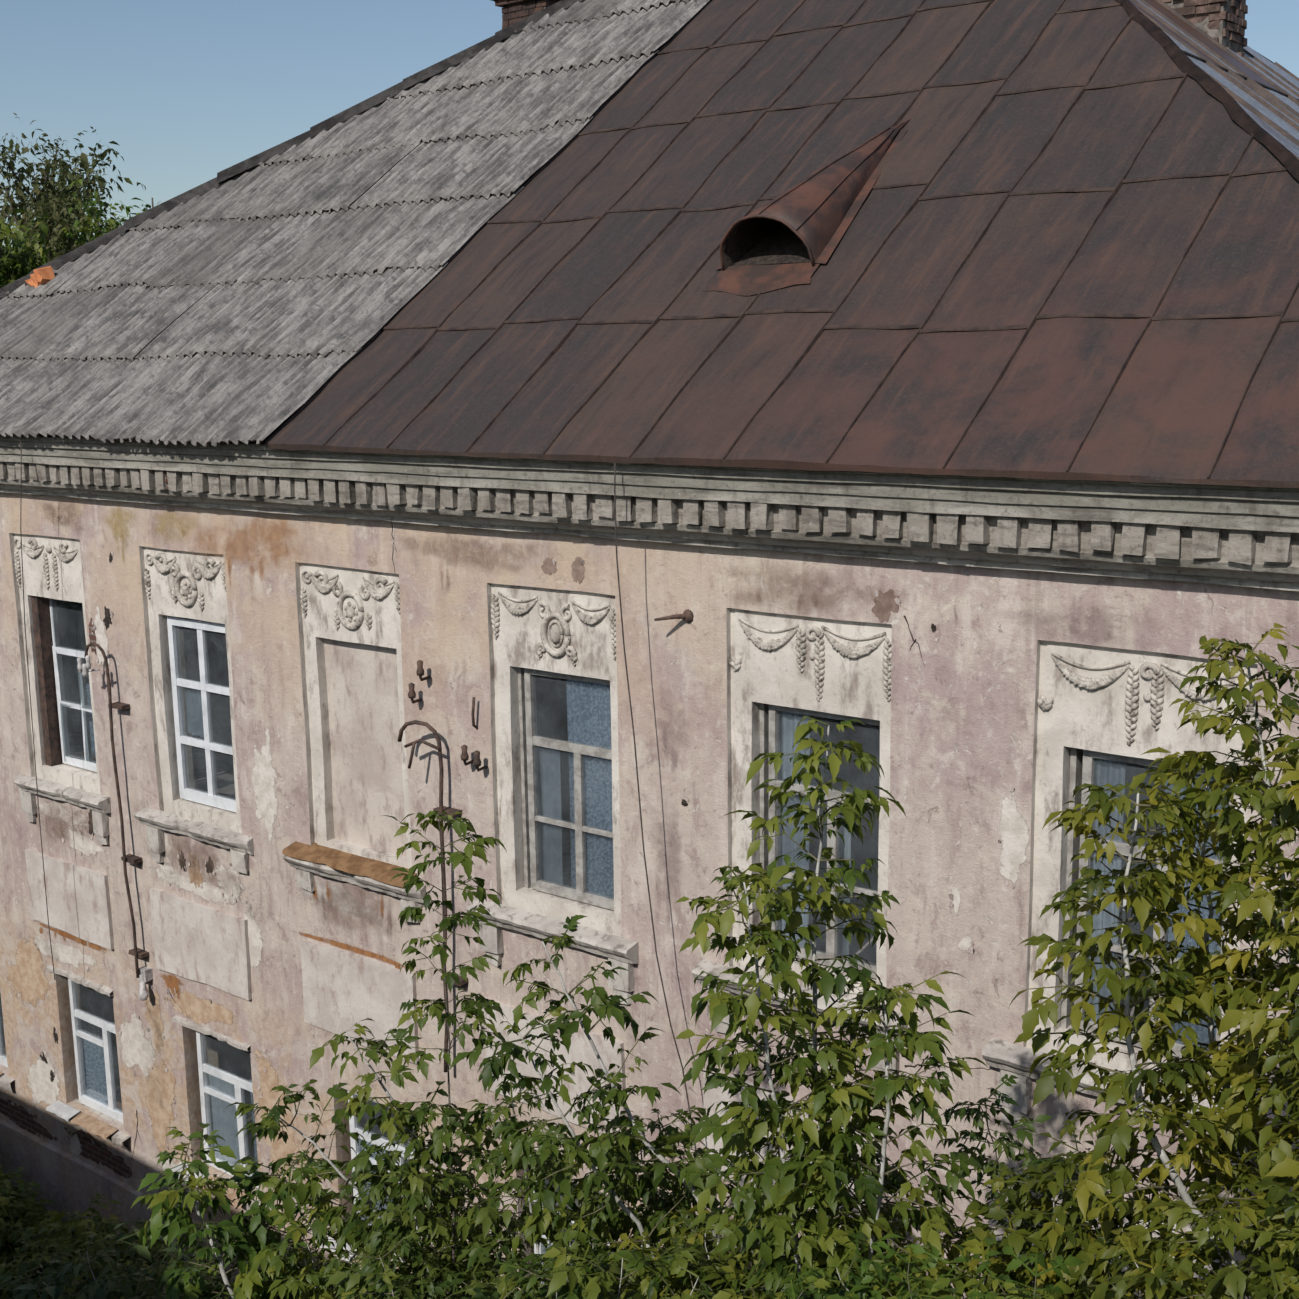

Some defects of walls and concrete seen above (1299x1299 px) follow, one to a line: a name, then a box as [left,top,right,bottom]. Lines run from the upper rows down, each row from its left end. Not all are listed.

spalling [541,556,585,584]
spalling [871,589,901,623]
flaking render [251,727,278,843]
flaking render [998,787,1030,889]
flaking render [0,1027,132,1179]